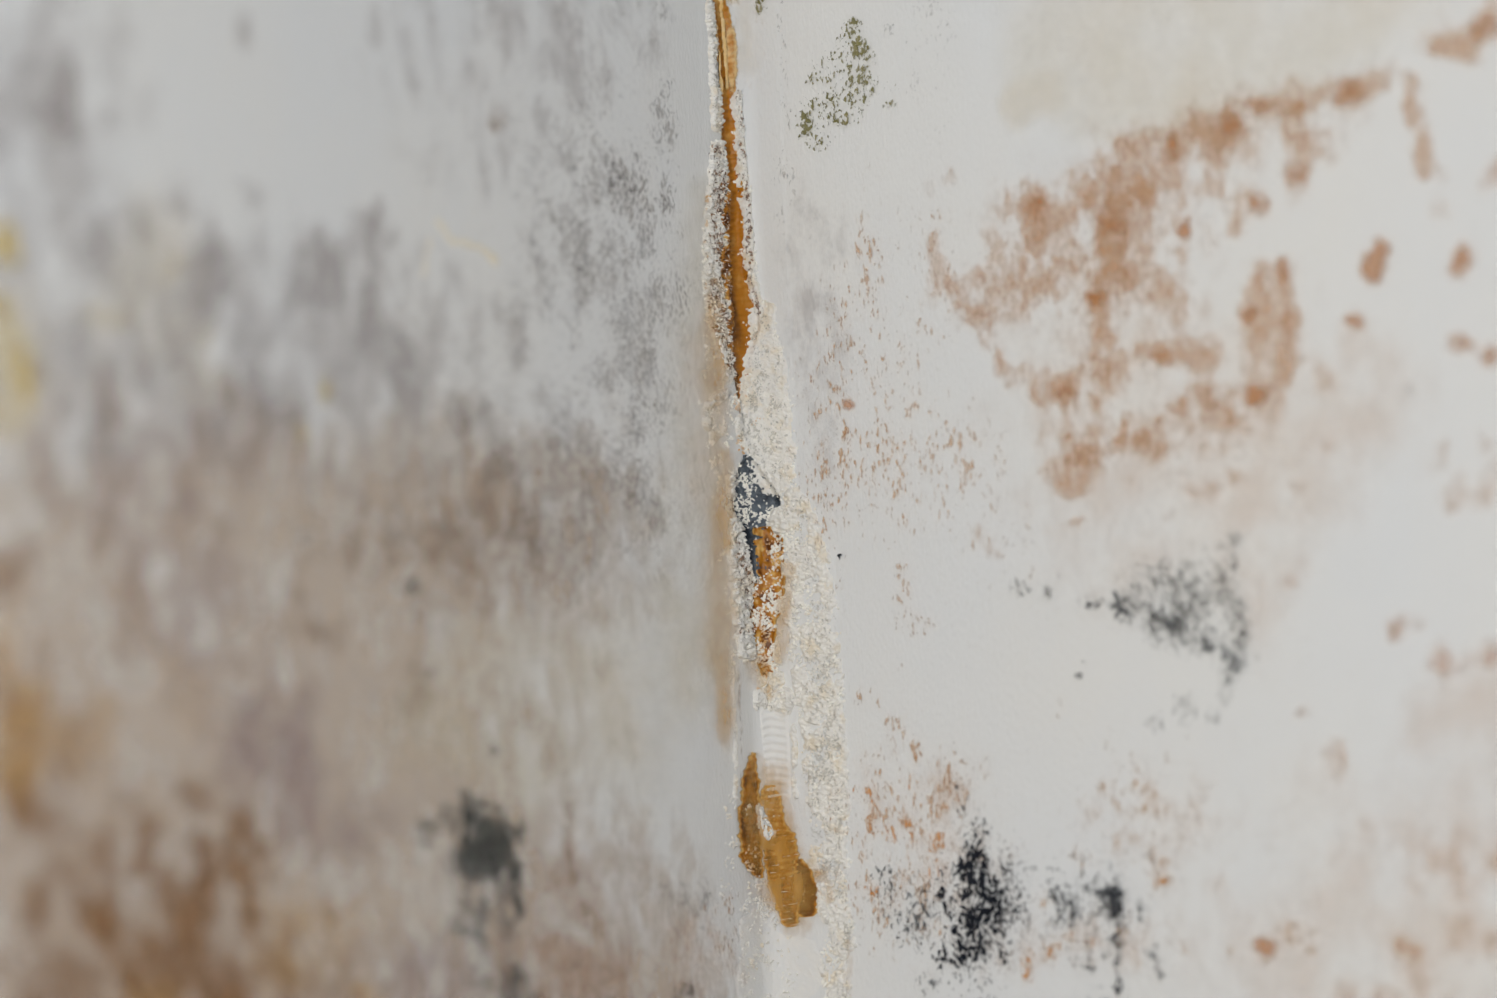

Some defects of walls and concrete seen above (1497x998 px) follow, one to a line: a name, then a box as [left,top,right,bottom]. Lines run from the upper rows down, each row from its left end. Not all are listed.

mould [795,17,896,151]
crack [712,0,754,413]
mould [1078,534,1250,684]
leakage [75,814,260,998]
mould [418,787,542,998]
mould [870,784,1164,998]